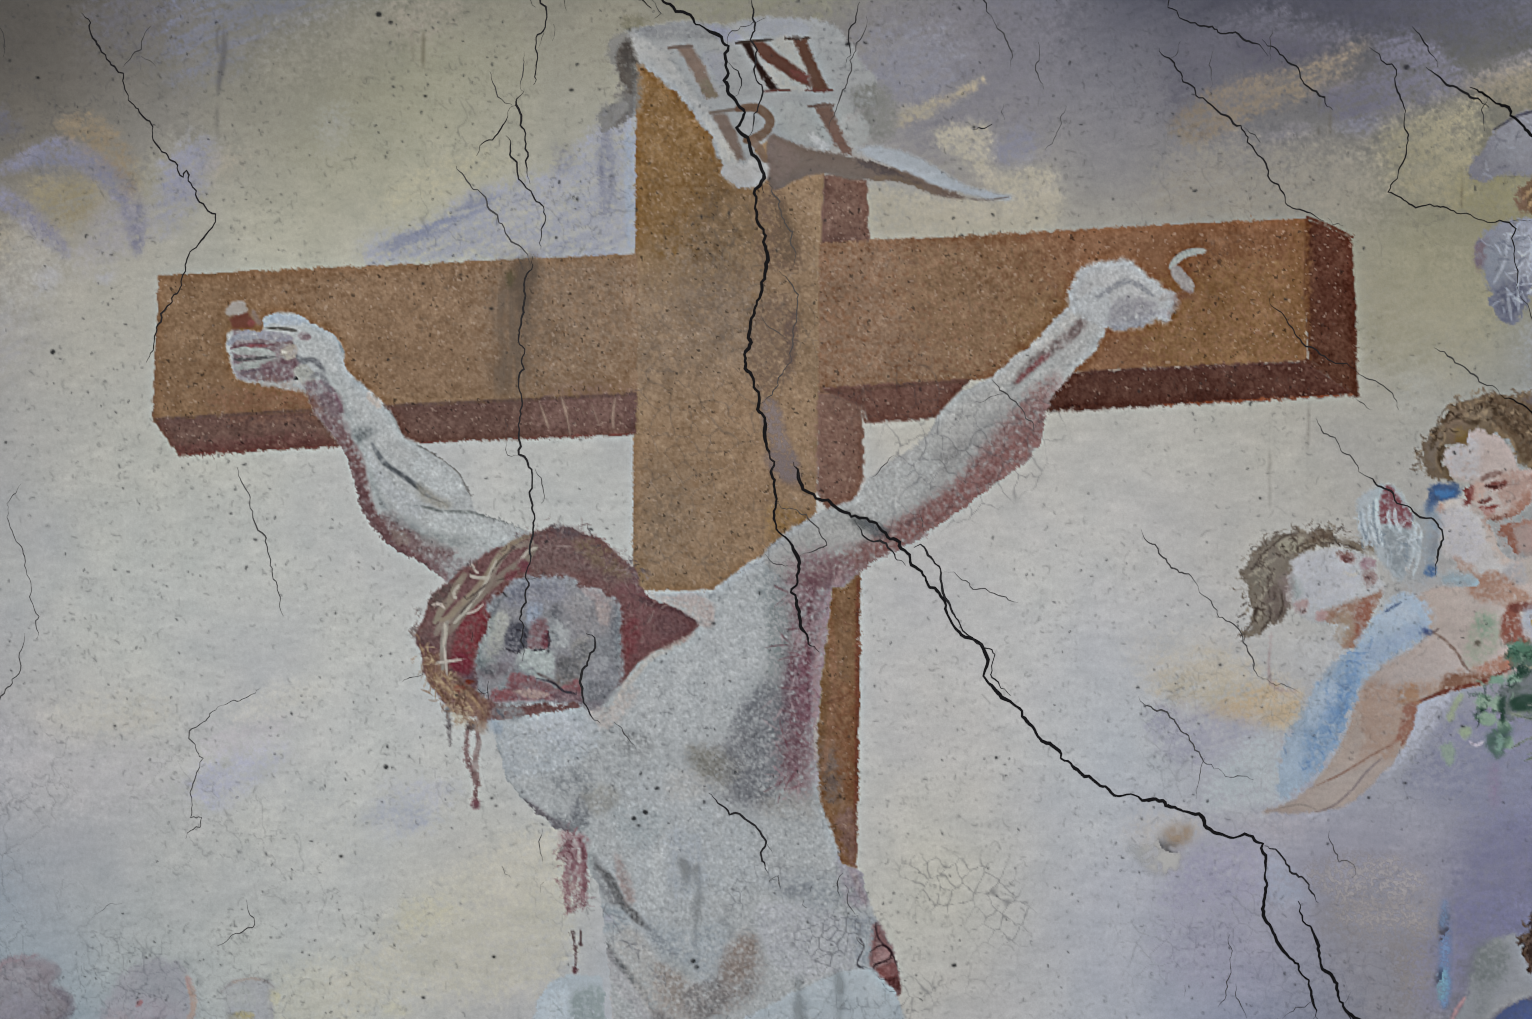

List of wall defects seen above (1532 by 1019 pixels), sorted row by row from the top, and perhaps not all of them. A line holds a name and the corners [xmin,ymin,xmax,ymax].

crack [83,14,216,362]
crack [1372,30,1532,318]
crack [456,0,566,661]
crack [1269,299,1398,409]
crack [1437,349,1532,413]
crack [0,484,39,699]
crack [579,633,631,742]
crack [642,0,1361,1019]
crack [1317,421,1444,574]